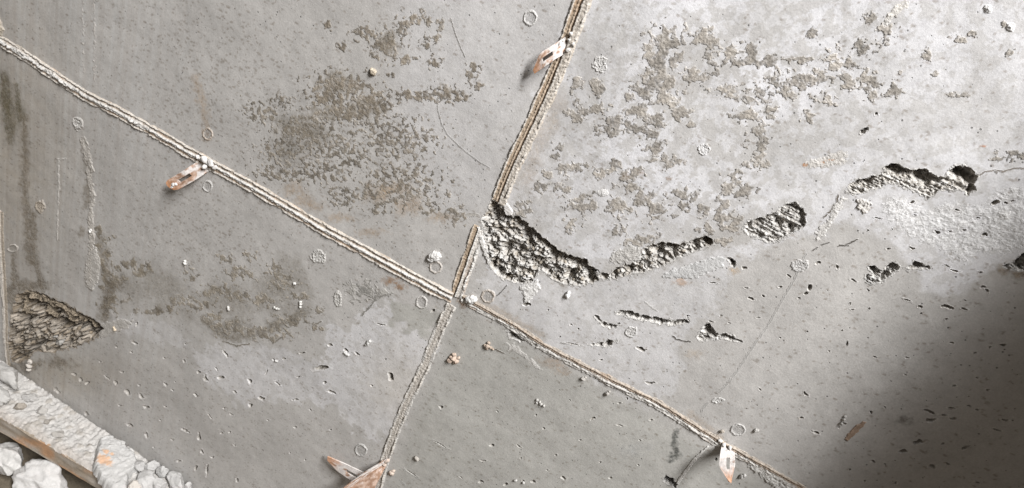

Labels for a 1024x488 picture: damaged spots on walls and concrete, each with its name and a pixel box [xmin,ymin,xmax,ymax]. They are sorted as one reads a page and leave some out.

peeling [921,46,940,79]
peeling [941,91,971,99]
spalling [230,8,906,287]
spalling [844,162,981,217]
spalling [814,245,963,292]
spalling [8,223,361,364]
spalling [558,308,744,349]